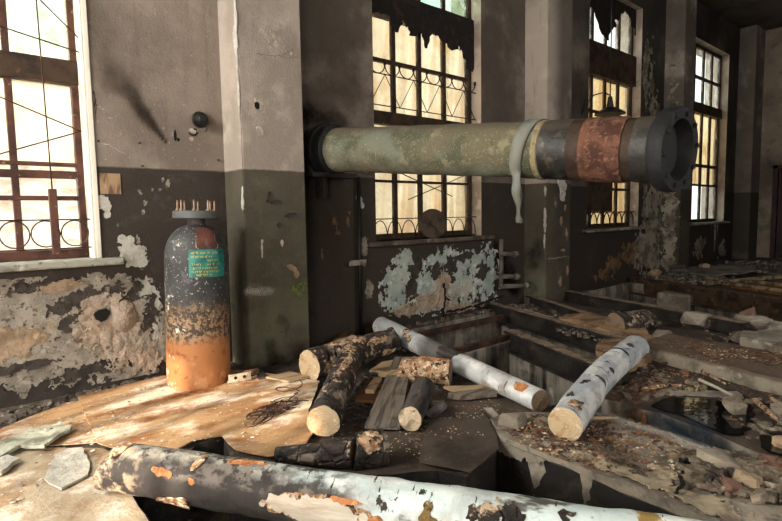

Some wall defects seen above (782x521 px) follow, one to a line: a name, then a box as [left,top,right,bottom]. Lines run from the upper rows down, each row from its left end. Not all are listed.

water stain [128,92,167,143]
rust [577,116,633,183]
peeling [0,194,166,399]
peeling [365,241,499,318]